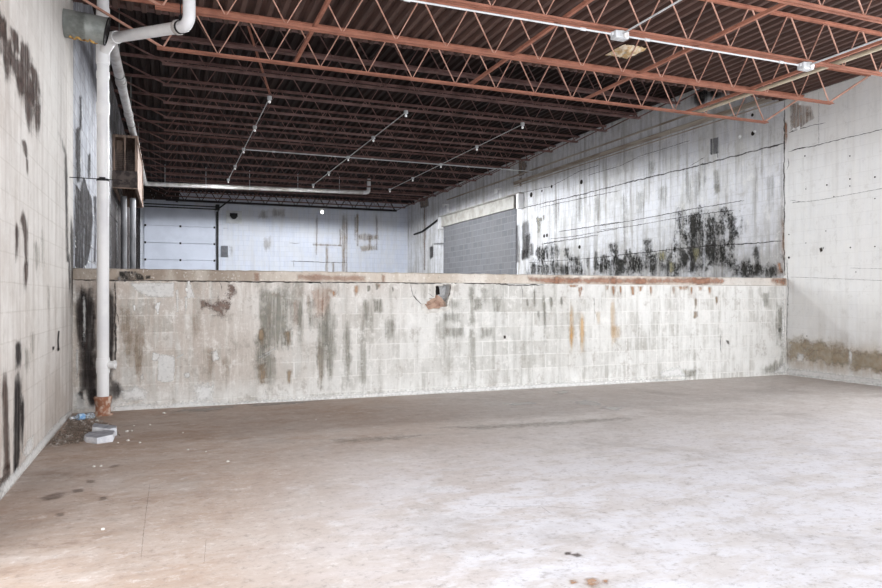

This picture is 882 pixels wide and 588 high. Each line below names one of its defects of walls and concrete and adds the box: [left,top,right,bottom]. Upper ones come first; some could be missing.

water stain [0,17,40,130]
water stain [526,209,783,278]
spalling [420,283,455,314]
corrosion [531,277,724,295]
water stain [109,292,695,411]
water stain [769,306,882,384]
water stain [0,377,96,496]